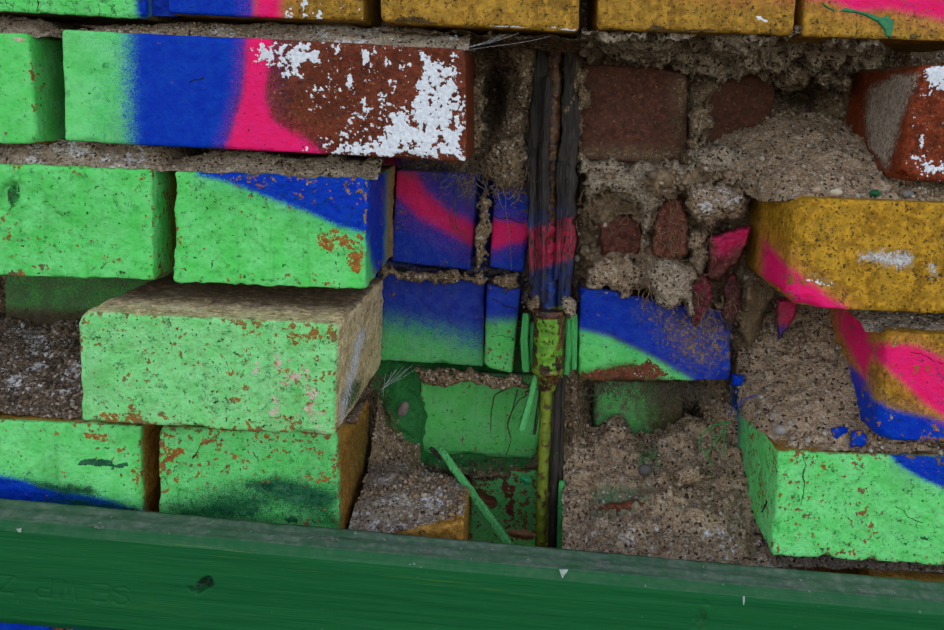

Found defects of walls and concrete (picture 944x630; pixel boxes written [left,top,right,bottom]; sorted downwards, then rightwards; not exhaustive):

peeling [581,358,676,381]
peeling [501,481,516,520]